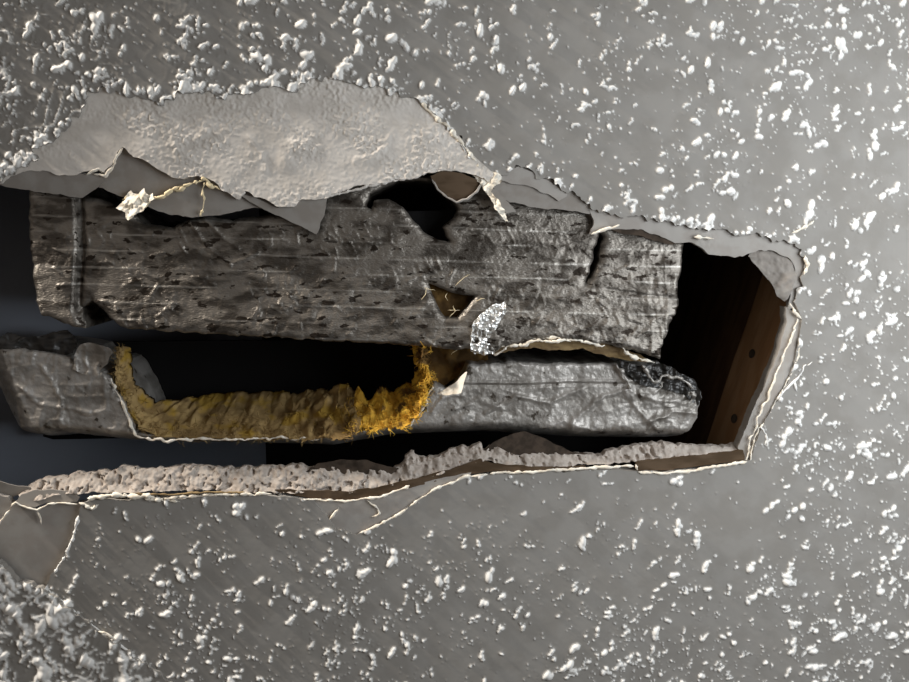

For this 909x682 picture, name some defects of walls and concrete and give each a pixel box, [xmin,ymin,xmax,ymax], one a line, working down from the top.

peeling [0,76,814,586]